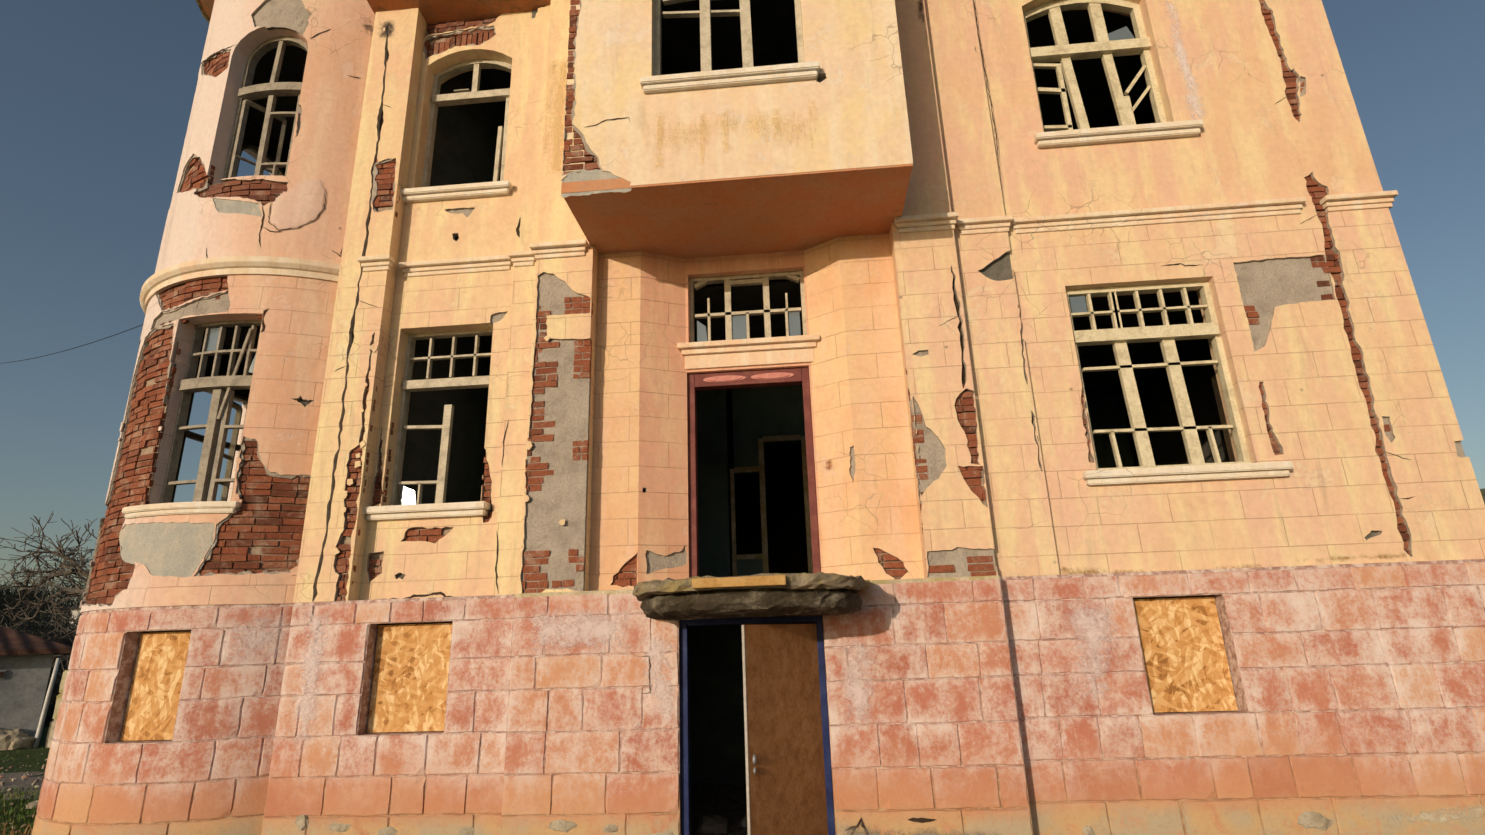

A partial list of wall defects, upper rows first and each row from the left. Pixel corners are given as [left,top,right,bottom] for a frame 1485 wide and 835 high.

spalling [178,154,288,206]
crack [379,104,391,133]
spalling [562,0,602,176]
crack [1259,0,1304,111]
spalling [79,276,230,608]
spalling [195,436,311,576]
crack [334,300,377,372]
flaking render [521,273,593,593]
flaking render [905,351,986,534]
crack [939,277,965,392]
flaking render [1234,258,1333,351]
crack [1301,189,1415,556]